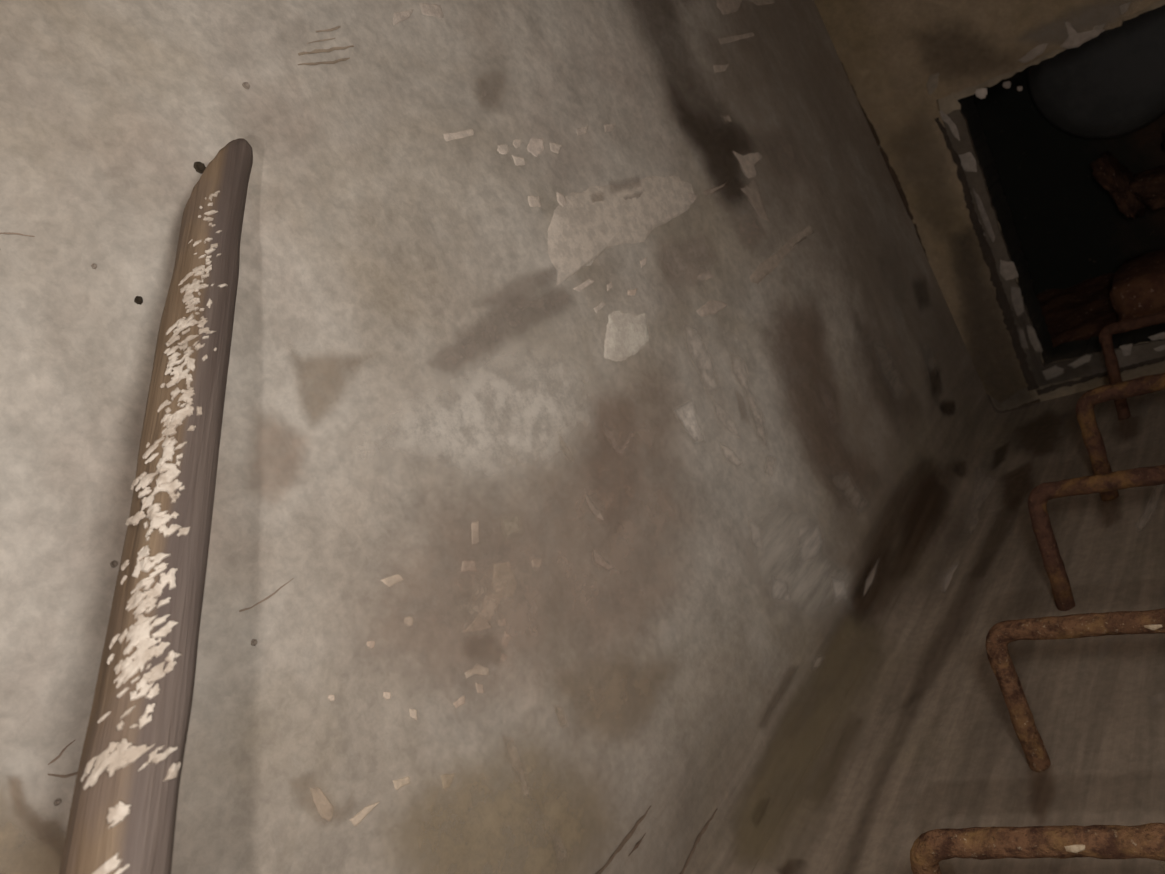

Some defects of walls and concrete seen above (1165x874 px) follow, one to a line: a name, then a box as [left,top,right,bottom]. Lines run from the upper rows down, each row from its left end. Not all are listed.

flaking render [548,138,798,362]
peeling [80,191,228,790]
peeling [92,852,130,874]
peeling [106,801,131,829]
flaking render [350,801,380,826]
crack [595,806,651,874]
crack [680,808,718,874]